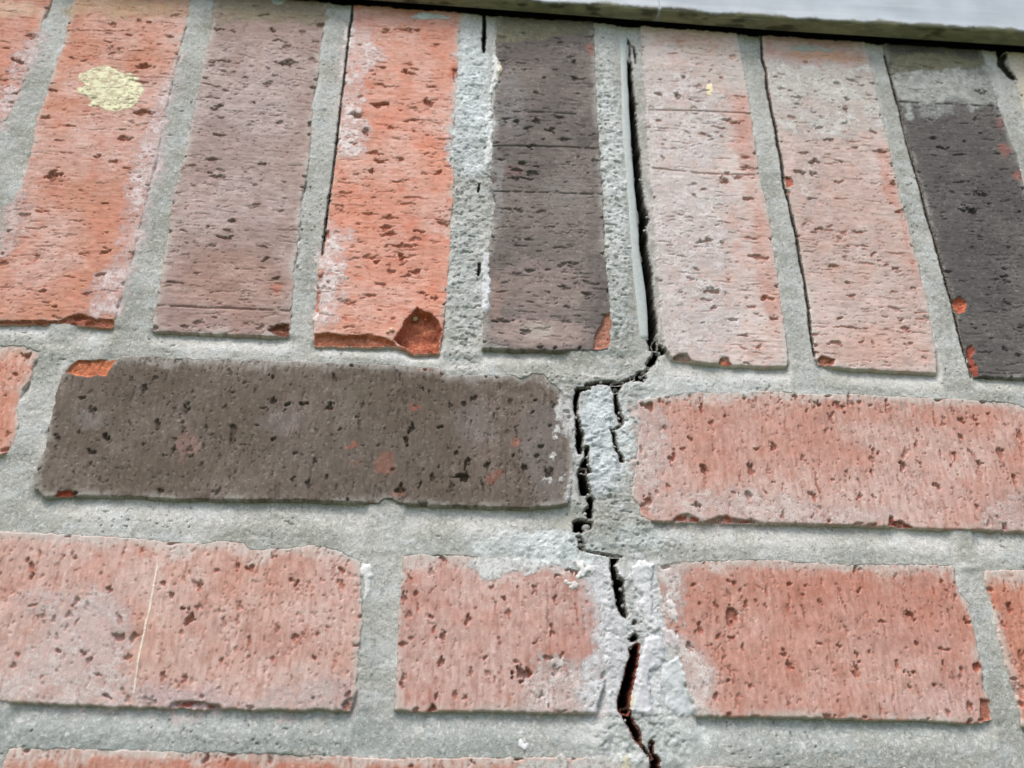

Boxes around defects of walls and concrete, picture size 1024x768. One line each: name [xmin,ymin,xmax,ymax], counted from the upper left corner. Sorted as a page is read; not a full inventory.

spalling [66,359,116,378]
spalling [314,307,443,354]
crack [572,39,667,768]
water stain [467,530,719,768]